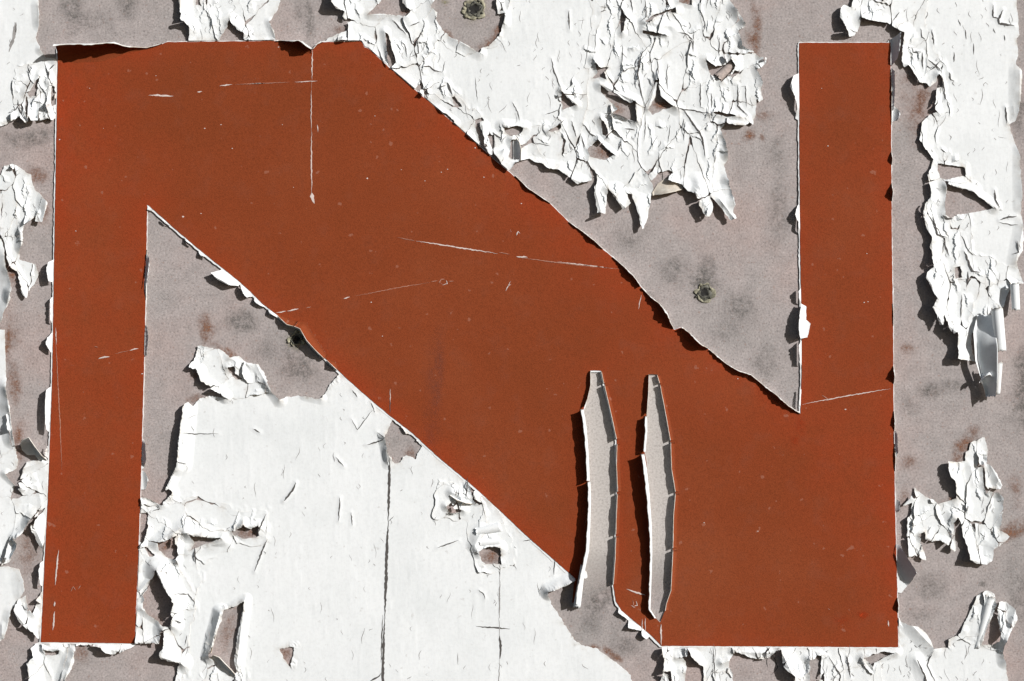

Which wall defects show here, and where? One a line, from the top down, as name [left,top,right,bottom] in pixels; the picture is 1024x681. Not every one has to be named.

peeling [0,0,57,126]
peeling [326,0,767,229]
crack [532,12,720,180]
peeling [840,0,1024,397]
peeling [0,164,632,681]
crack [352,391,394,681]
peeling [895,437,1009,593]
peeling [618,608,650,639]
peeling [660,591,1018,681]